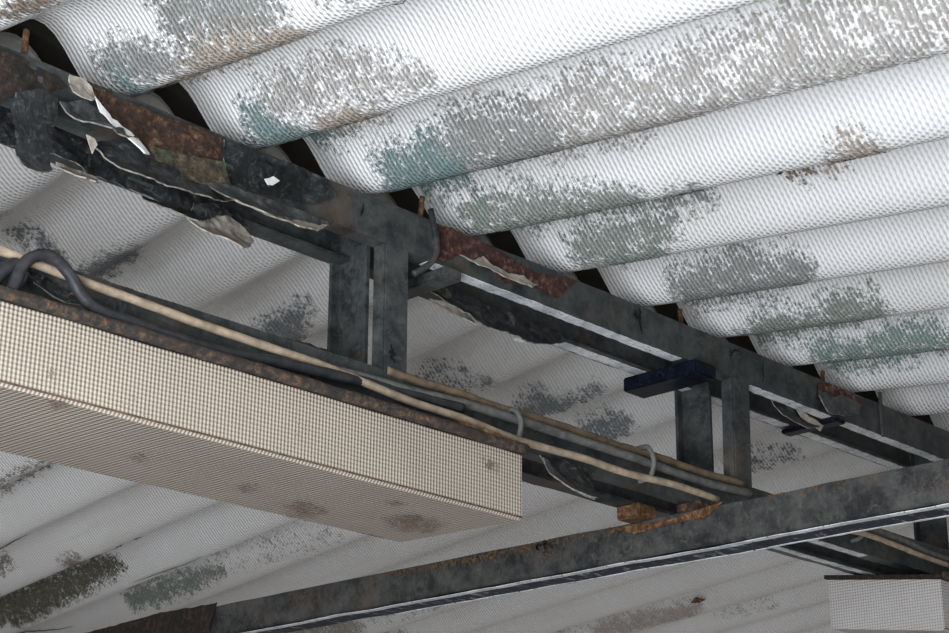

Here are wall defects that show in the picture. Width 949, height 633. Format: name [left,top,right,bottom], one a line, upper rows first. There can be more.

corrosion [88,82,231,185]
peeling [0,0,949,380]
corrosion [432,226,575,298]
corrosion [380,502,722,577]